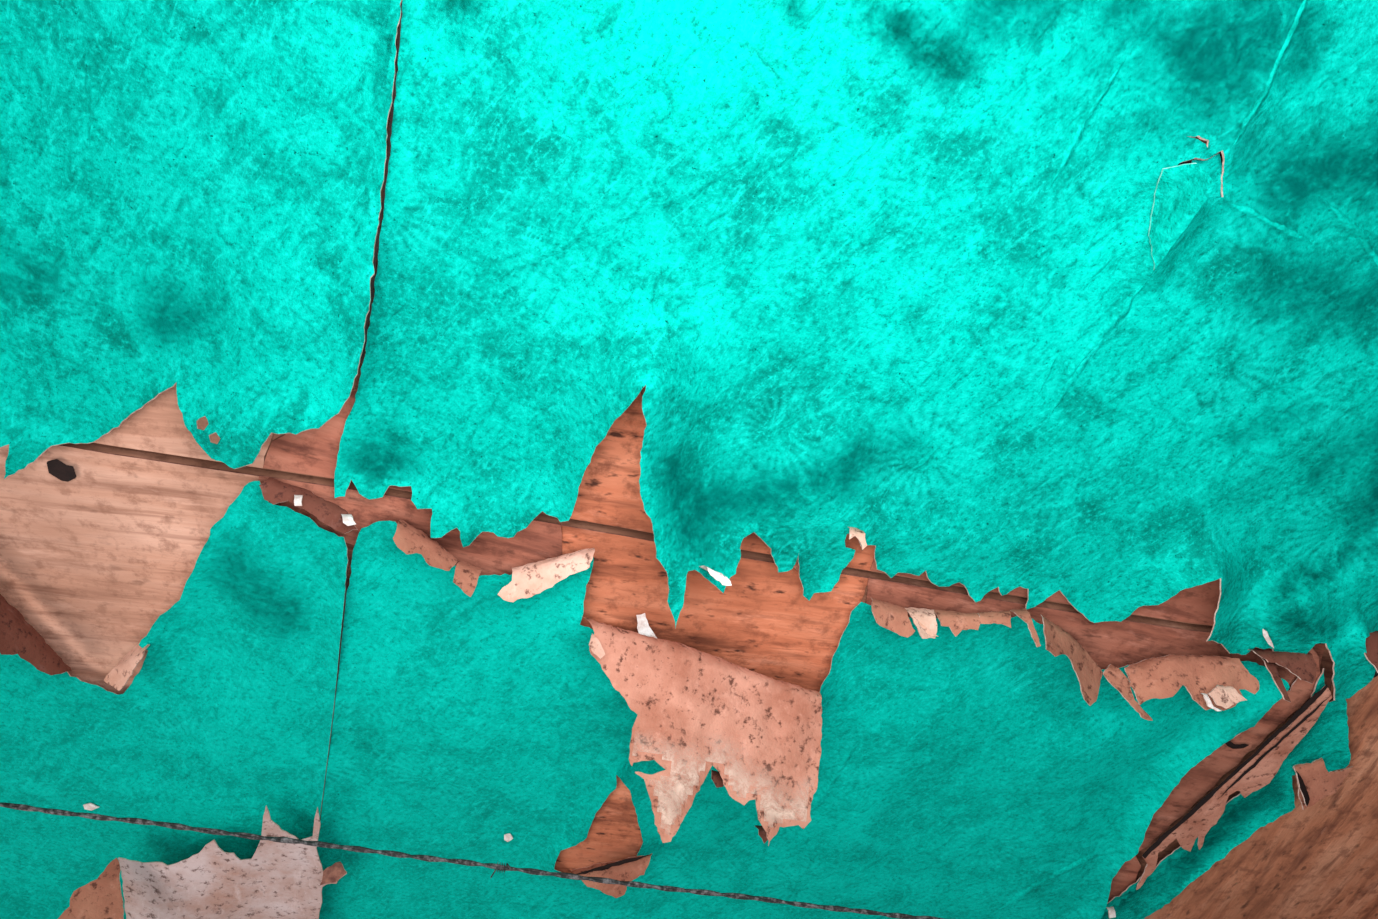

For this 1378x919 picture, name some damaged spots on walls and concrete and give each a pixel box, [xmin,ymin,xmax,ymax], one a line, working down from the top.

crack [360,2,402,363]
peeling [0,385,1378,919]